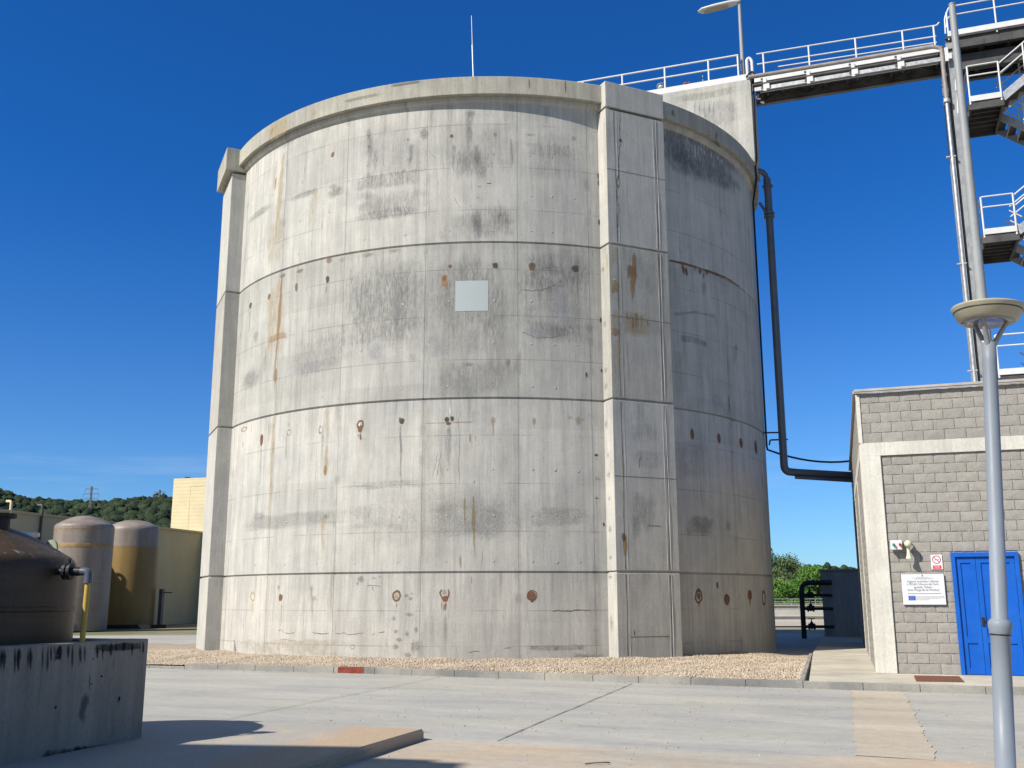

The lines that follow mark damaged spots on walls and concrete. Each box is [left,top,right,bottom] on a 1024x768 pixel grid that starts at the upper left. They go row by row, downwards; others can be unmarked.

leakage [664,130,734,187]
corrosion [612,254,636,298]
leakage [0,643,144,670]